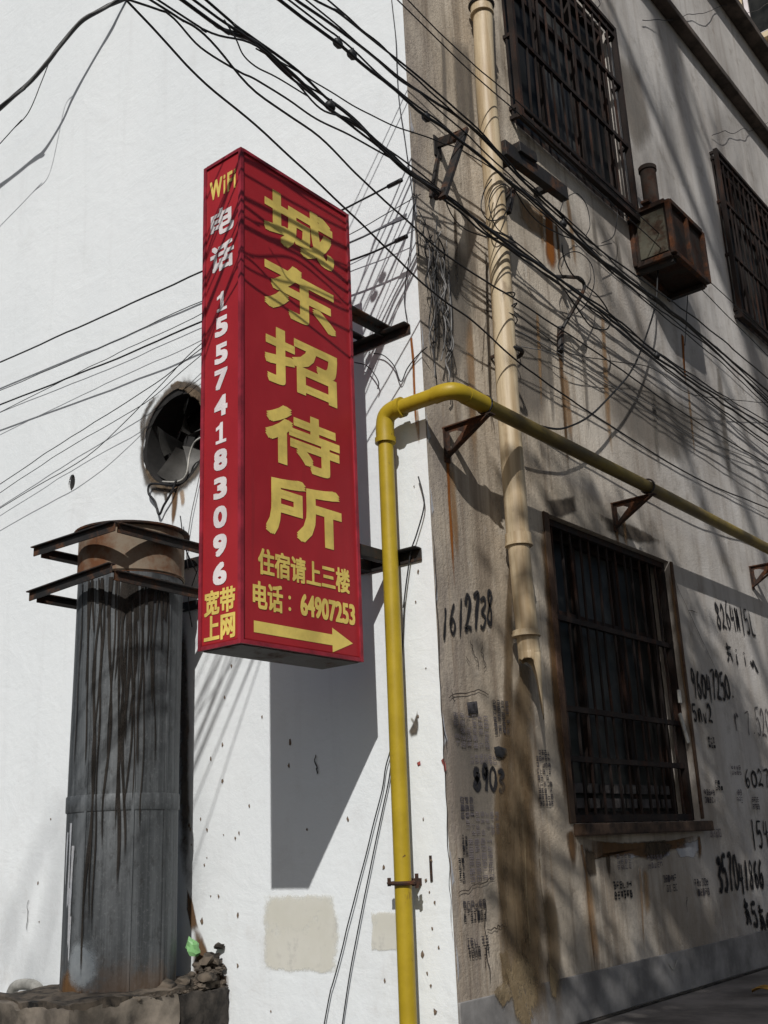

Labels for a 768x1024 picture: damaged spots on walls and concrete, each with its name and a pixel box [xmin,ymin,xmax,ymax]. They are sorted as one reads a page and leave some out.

corrosion [521,203,560,268]
corrosion [446,462,458,560]
leakage [455,567,560,1024]